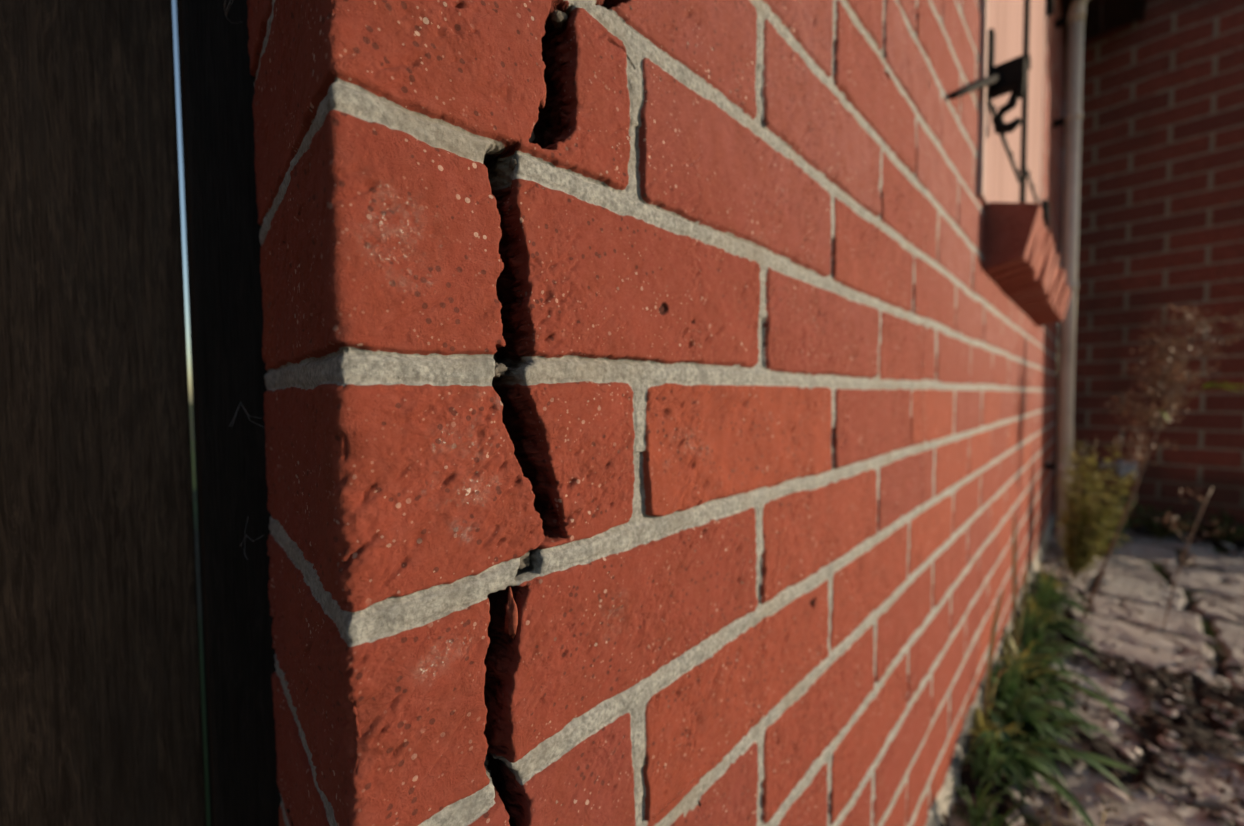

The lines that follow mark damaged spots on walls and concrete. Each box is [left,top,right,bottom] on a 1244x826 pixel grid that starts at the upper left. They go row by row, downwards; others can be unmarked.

crack [482,0,636,826]